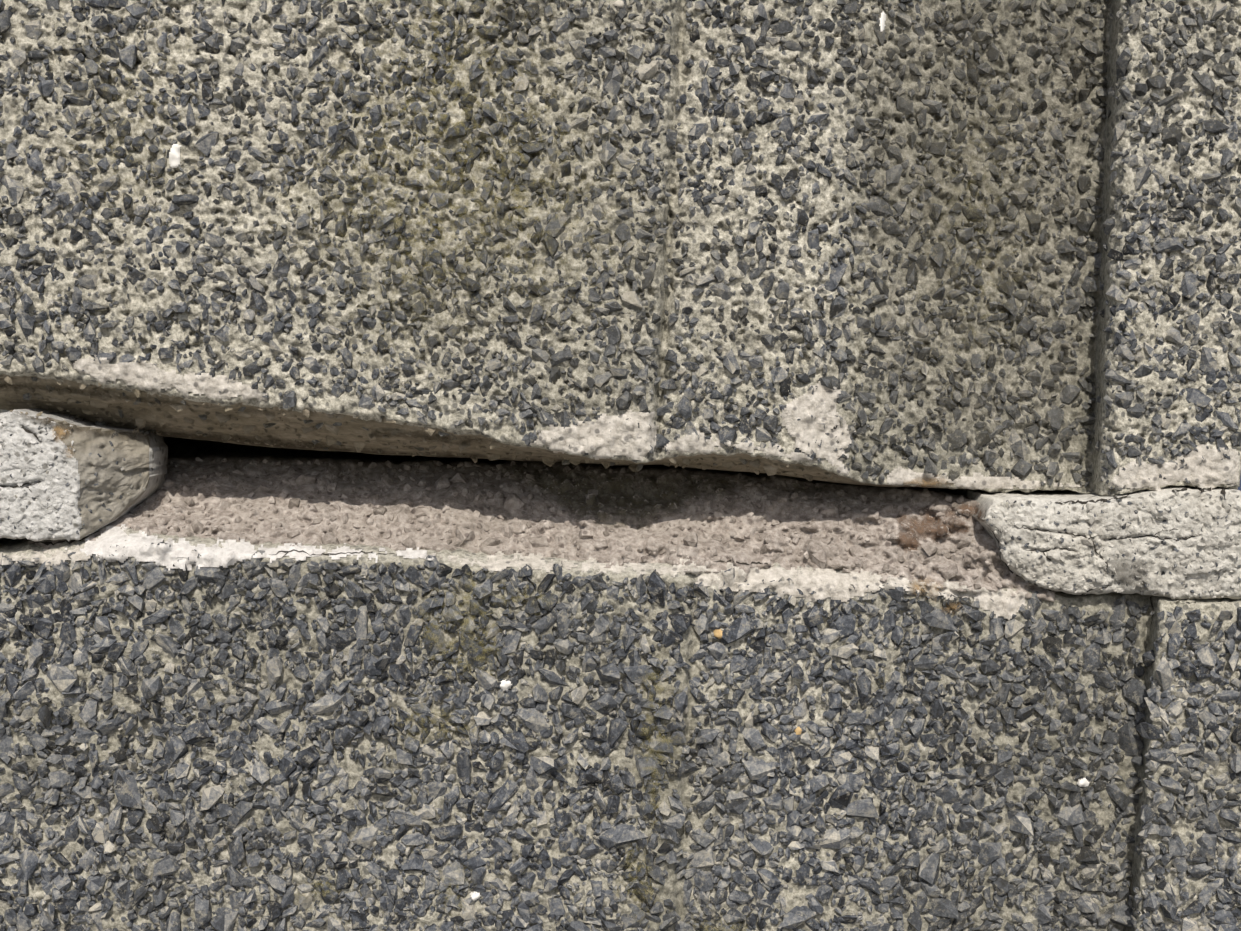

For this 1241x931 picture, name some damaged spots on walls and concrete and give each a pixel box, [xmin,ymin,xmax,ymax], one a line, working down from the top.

spalling [0,355,1082,621]